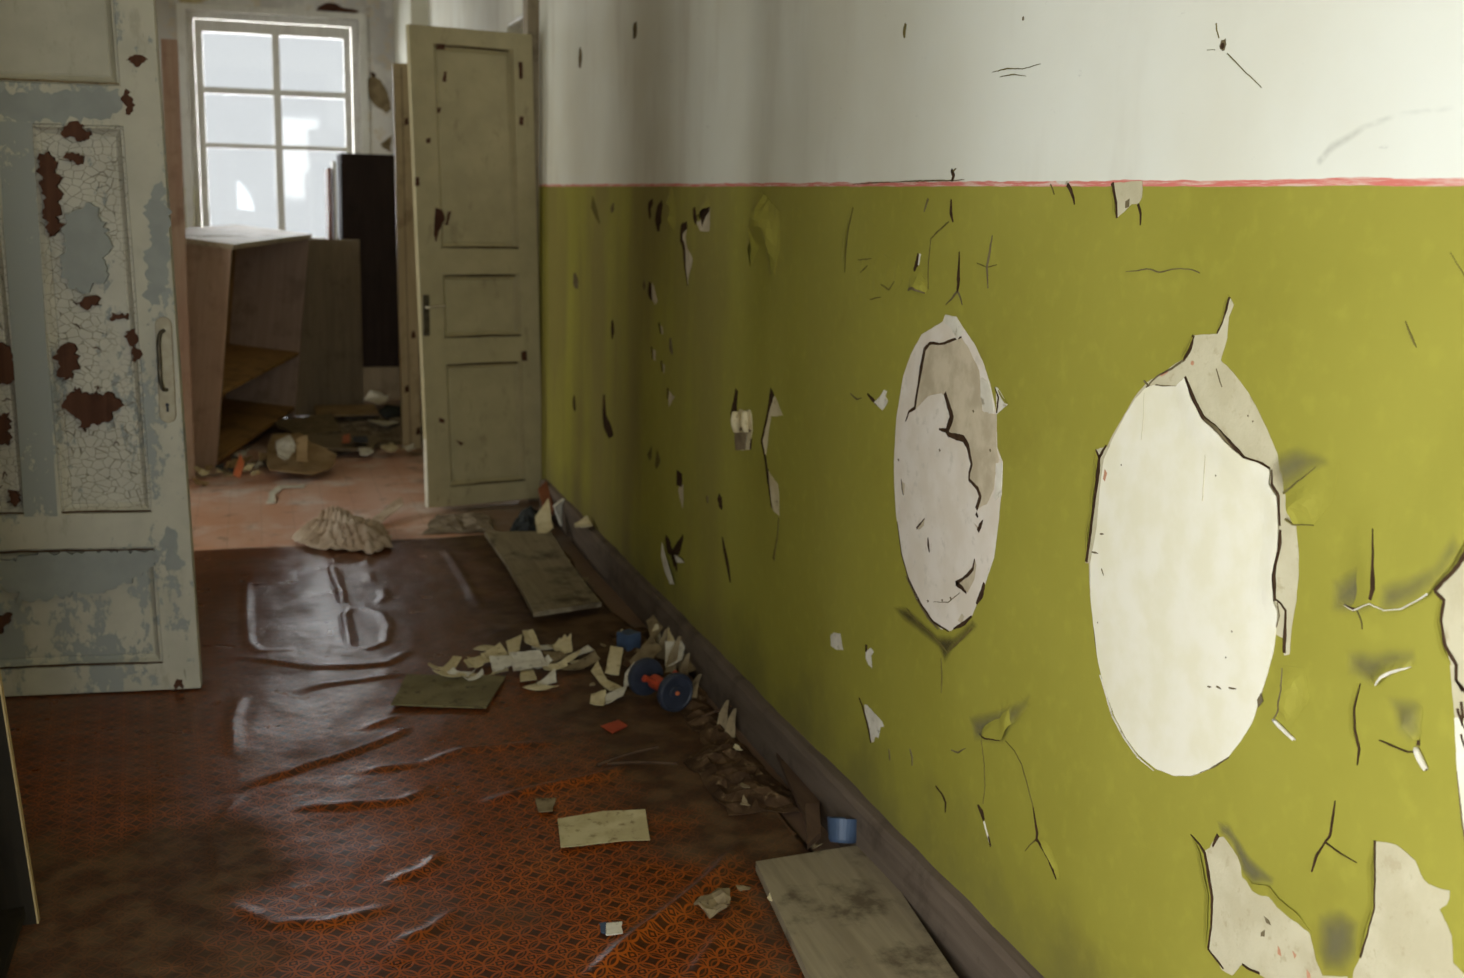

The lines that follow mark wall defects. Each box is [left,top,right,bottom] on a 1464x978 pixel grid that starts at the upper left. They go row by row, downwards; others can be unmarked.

peeling [1110,181,1143,225]
peeling [730,388,783,561]
peeling [850,314,1003,632]
peeling [1083,295,1339,776]
peeling [859,698,884,743]
crack [1347,683,1361,765]
peeling [1433,551,1464,837]
crack [1005,741,1060,879]
peeling [1189,834,1464,978]
crack [1311,801,1357,872]